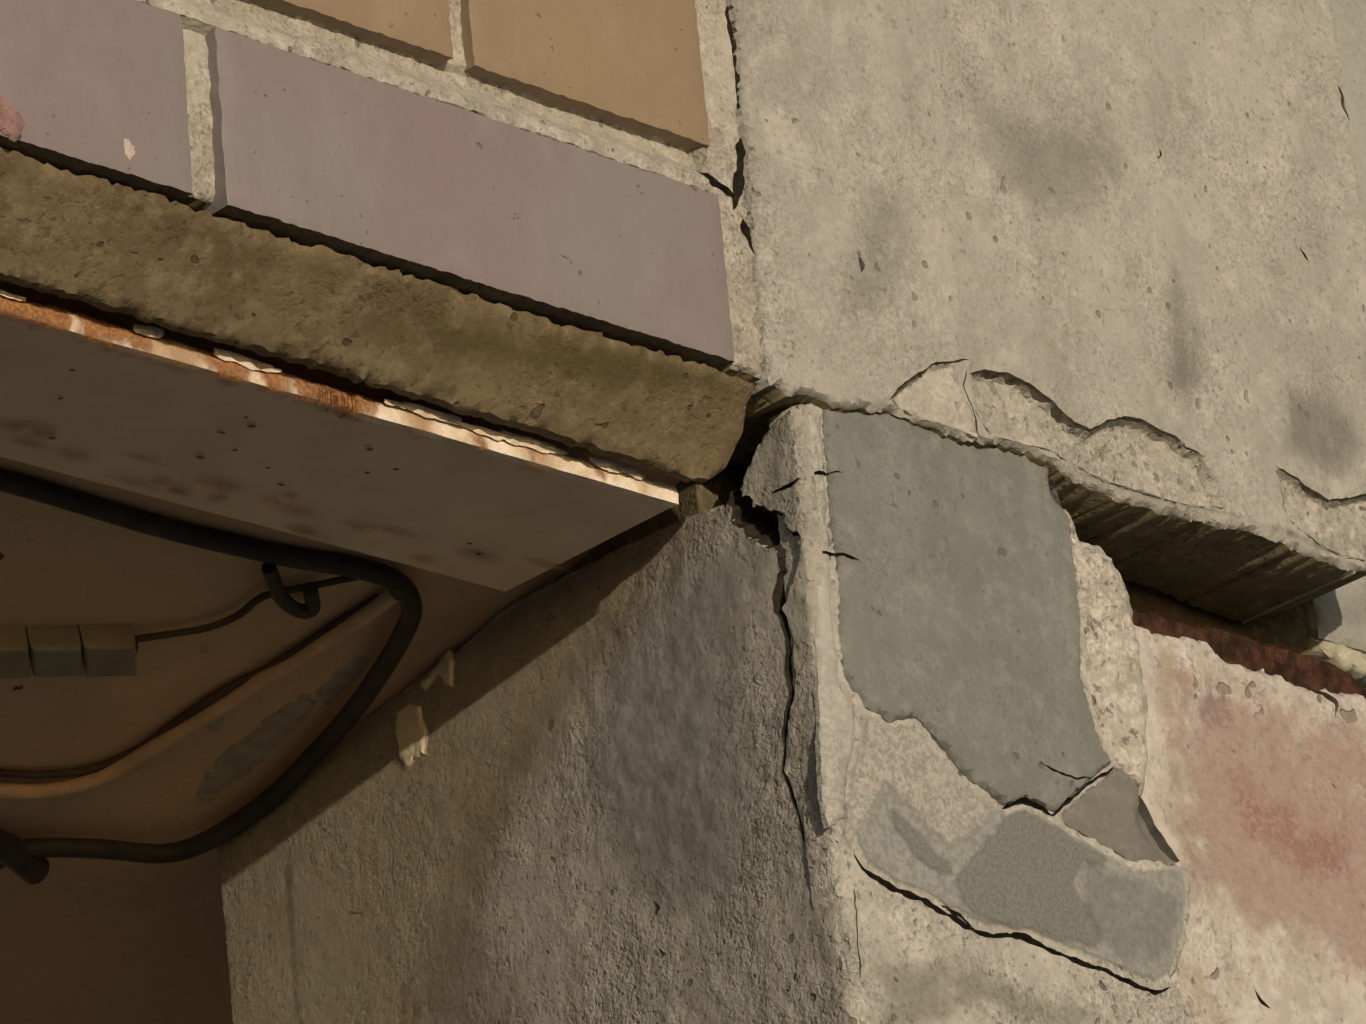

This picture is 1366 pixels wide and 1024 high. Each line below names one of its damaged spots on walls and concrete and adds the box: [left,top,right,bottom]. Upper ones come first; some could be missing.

crack [696,6,754,254]
rust [0,295,151,350]
rust [197,348,377,417]
spalling [892,362,1224,509]
spalling [1277,475,1366,562]
crack [728,471,859,842]
peeling [844,718,991,846]
crack [854,855,1170,995]